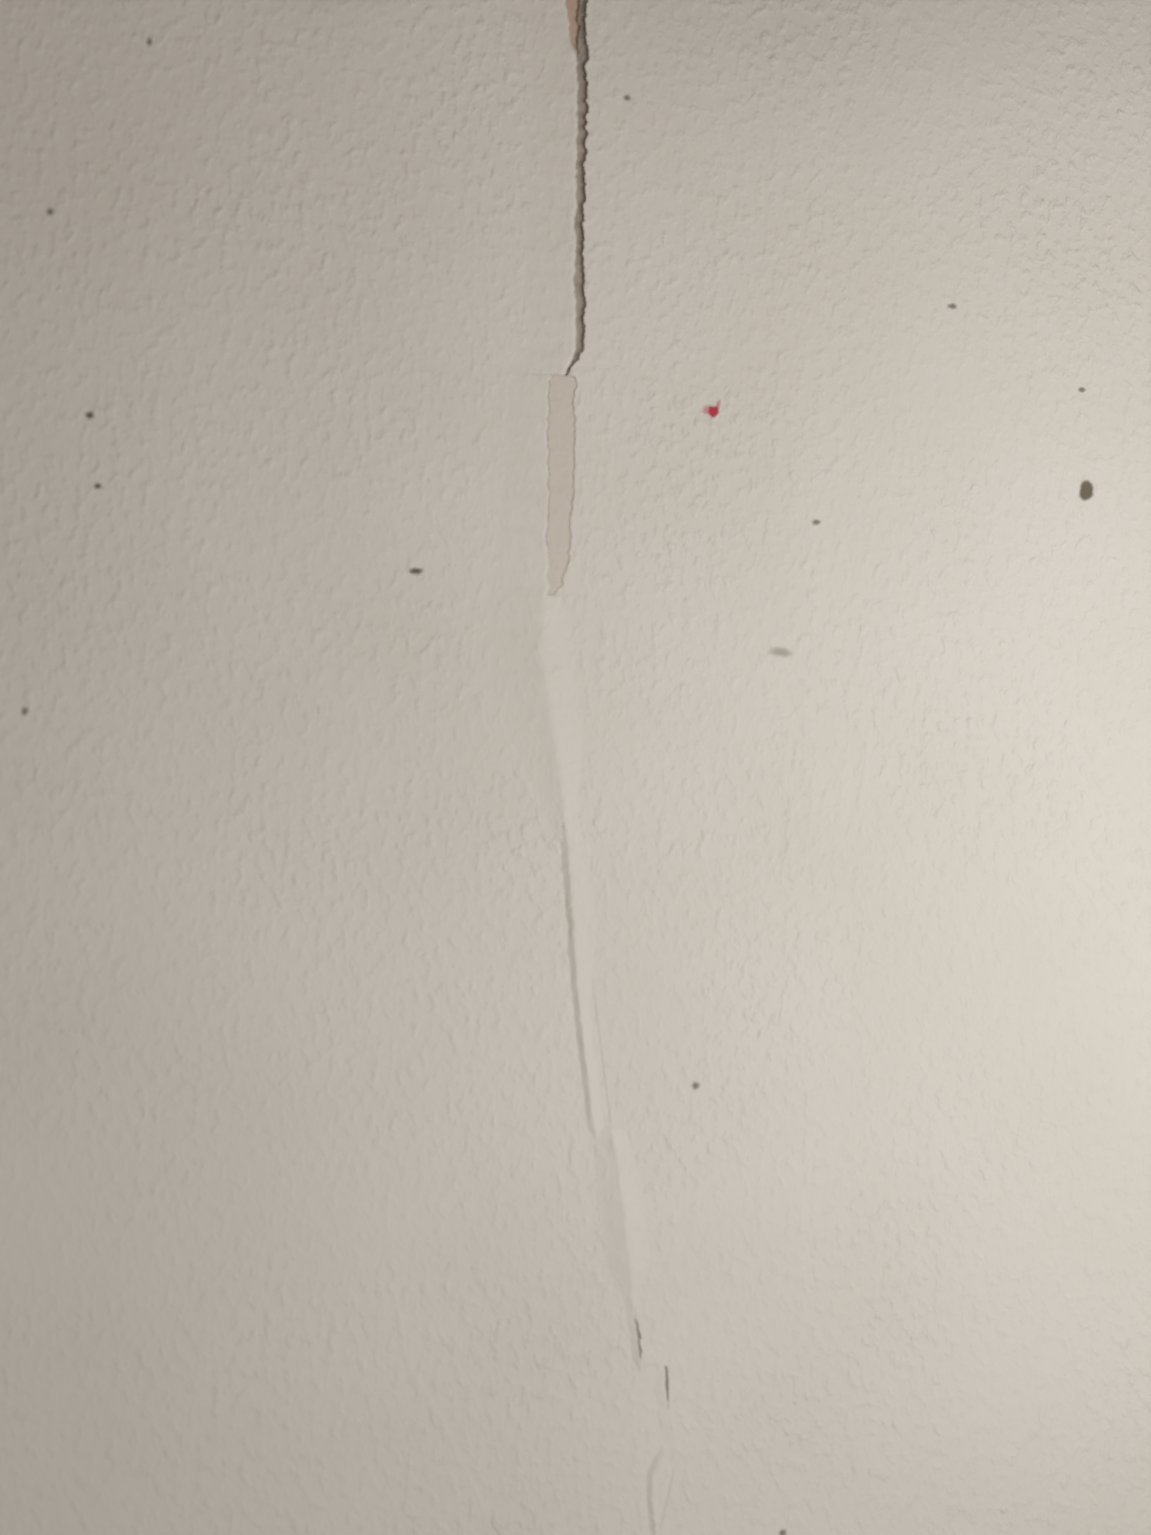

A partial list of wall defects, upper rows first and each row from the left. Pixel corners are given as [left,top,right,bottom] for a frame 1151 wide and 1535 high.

peeling [546,375,577,596]
crack [485,0,676,1535]